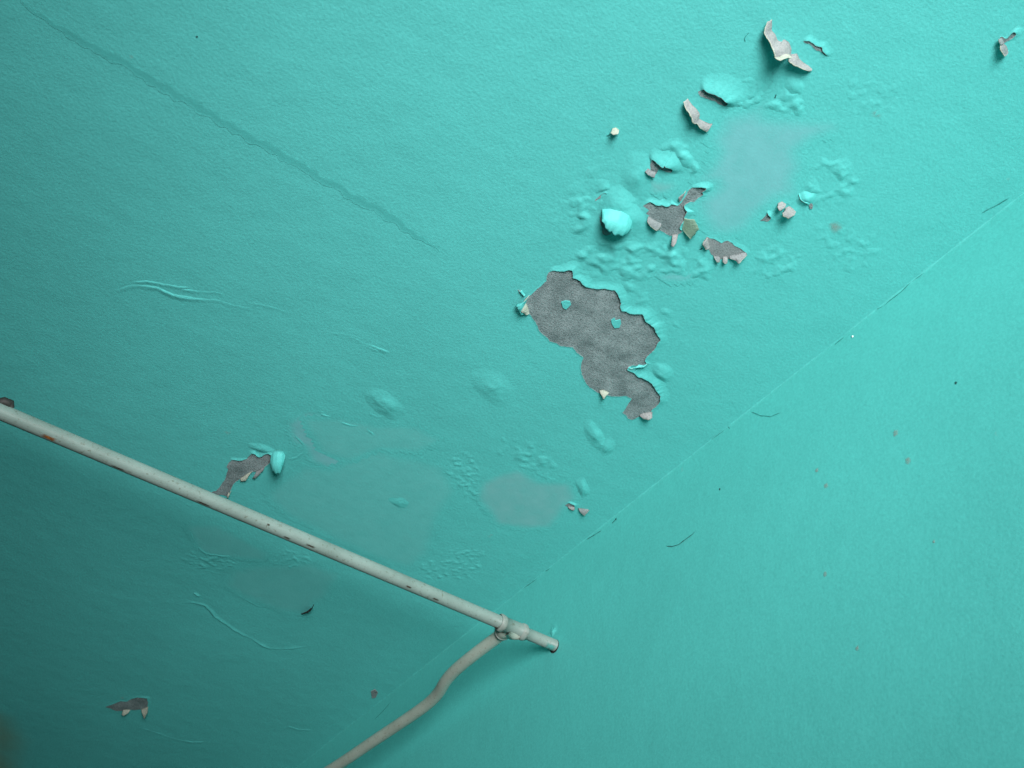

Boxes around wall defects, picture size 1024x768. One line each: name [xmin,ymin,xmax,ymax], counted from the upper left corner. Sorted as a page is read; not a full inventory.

peeling [998,25,1024,56]
peeling [595,19,849,264]
peeling [516,261,670,421]
peeling [210,443,285,498]
peeling [105,695,152,718]